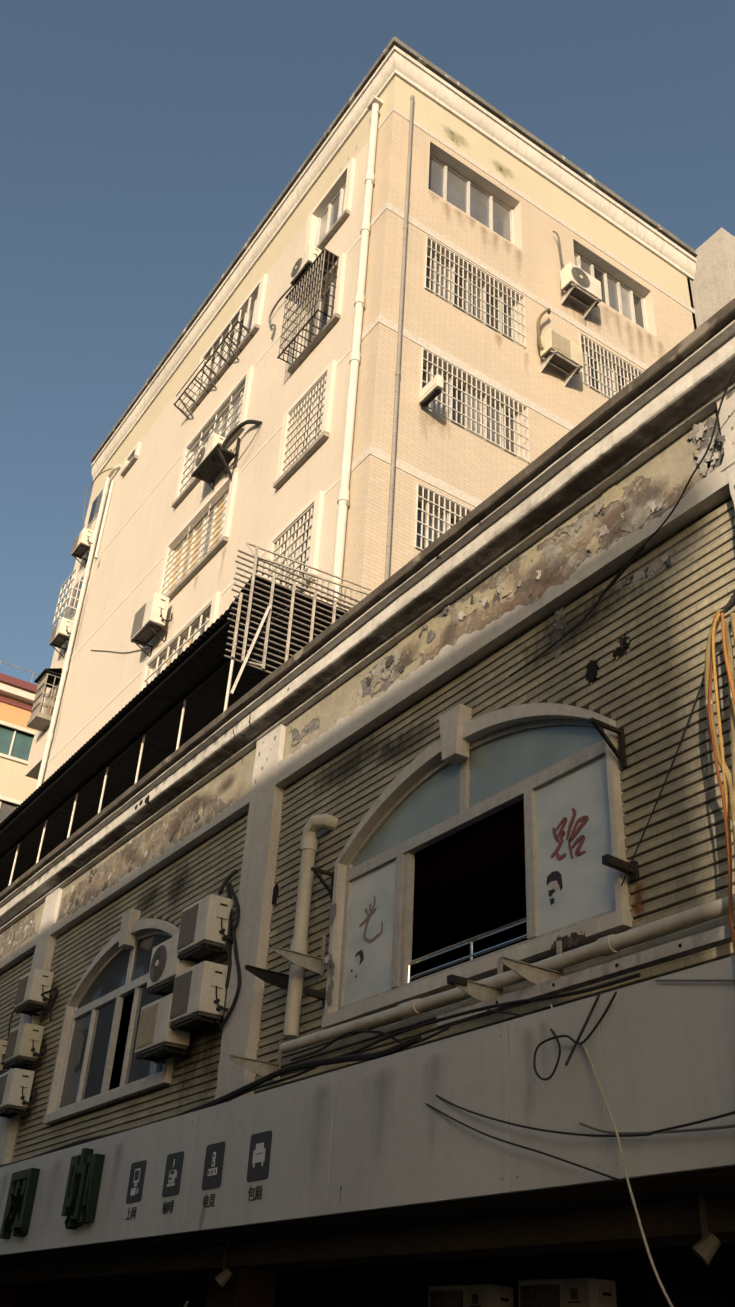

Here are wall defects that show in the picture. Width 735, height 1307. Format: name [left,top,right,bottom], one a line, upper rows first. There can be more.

peeling [360,388,735,697]
peeling [255,714,320,783]